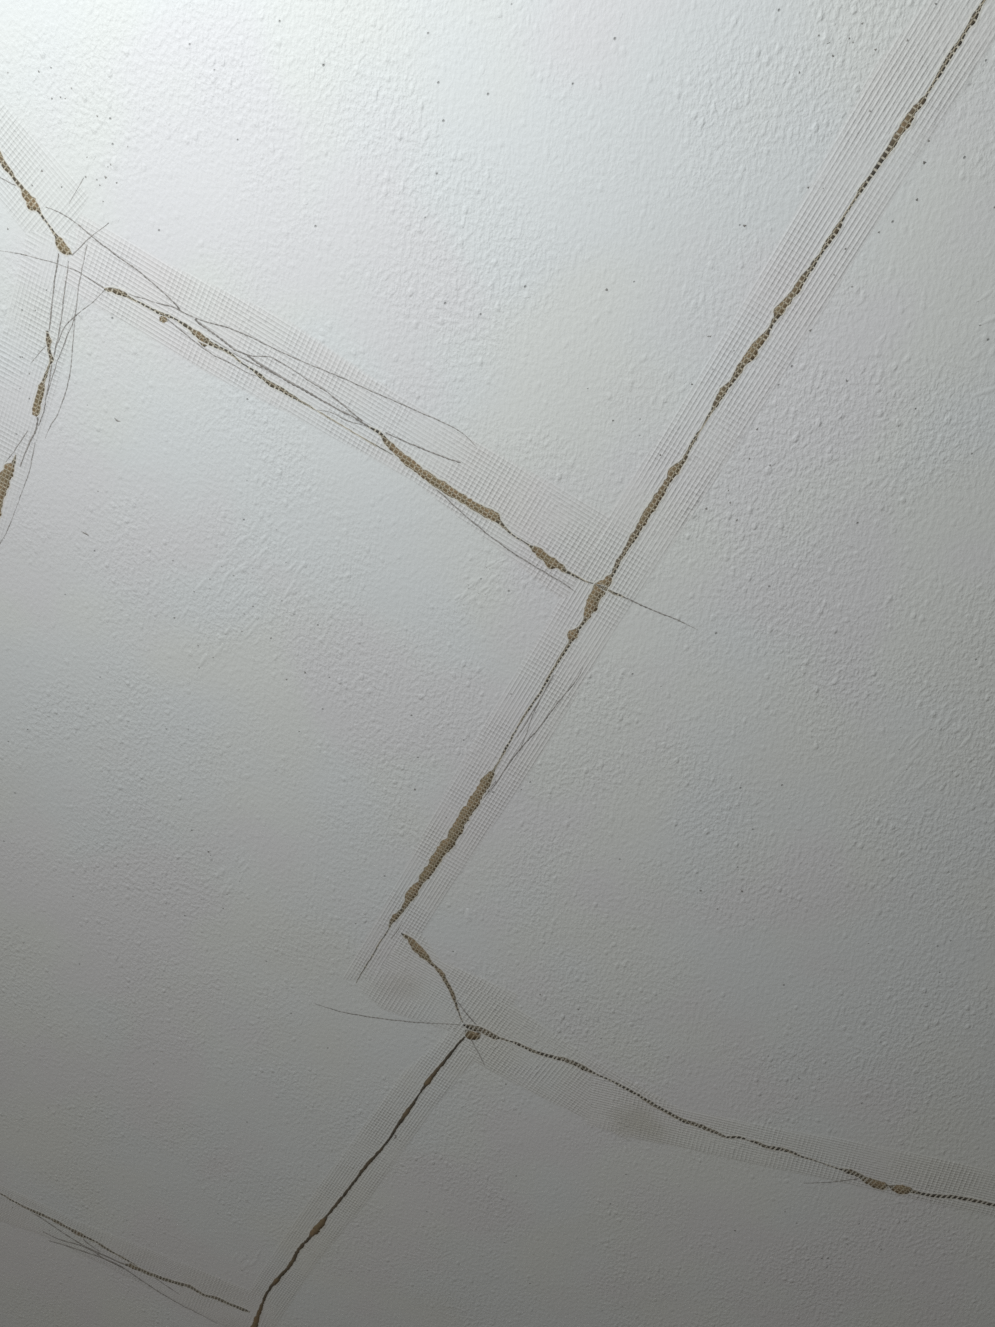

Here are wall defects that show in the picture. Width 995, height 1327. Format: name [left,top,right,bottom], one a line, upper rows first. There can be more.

crack [0,0,988,984]
crack [0,1192,250,1323]
crack [249,933,995,1327]